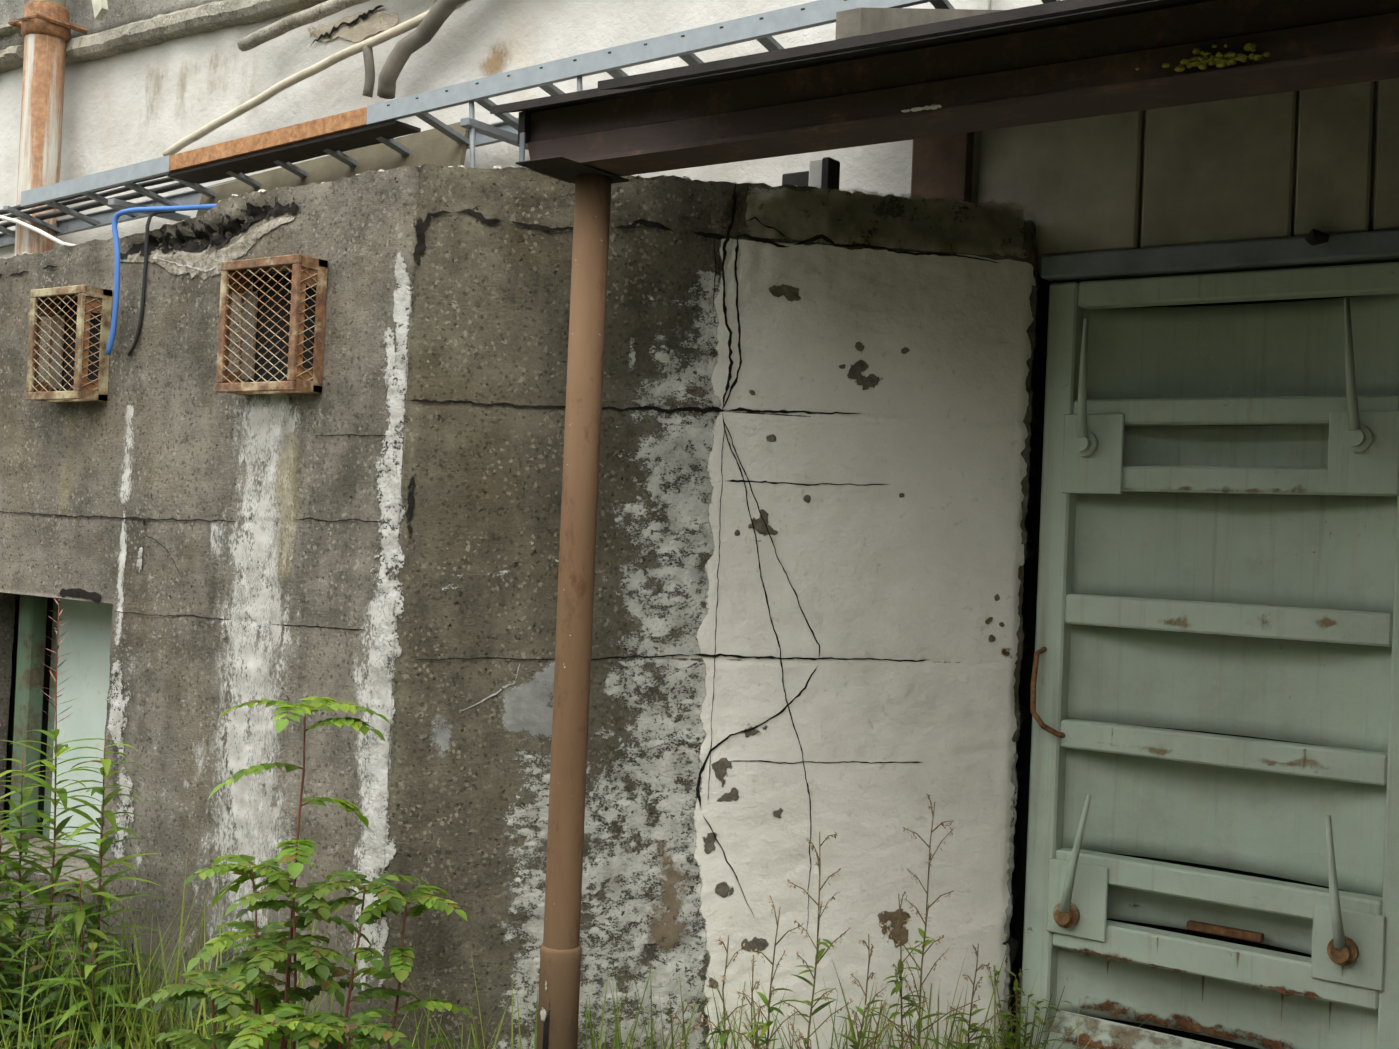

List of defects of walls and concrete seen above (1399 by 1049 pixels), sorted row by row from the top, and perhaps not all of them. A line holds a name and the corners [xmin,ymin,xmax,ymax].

spalling [120,197,299,280]
leakage [195,394,300,962]
leakage [347,252,413,991]
crack [416,655,555,663]
crack [410,399,566,409]
crack [417,206,573,237]
peeling [495,662,555,1049]
crack [591,183,998,938]
peeling [577,183,1038,1049]